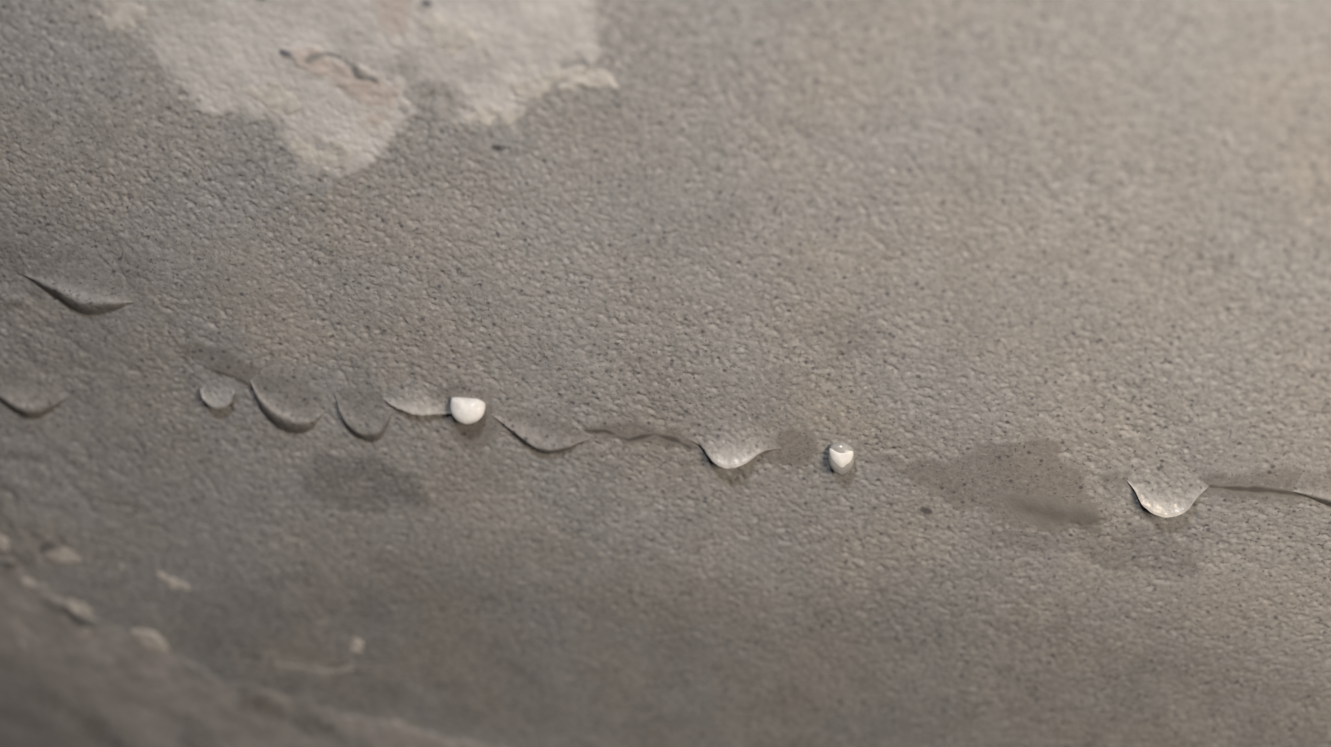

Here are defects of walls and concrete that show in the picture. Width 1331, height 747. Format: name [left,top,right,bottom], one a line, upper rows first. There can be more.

peeling [54,0,627,197]
damp [258,139,413,285]
damp [212,287,467,392]
damp [392,407,437,423]
damp [766,301,901,447]
damp [132,437,1331,747]